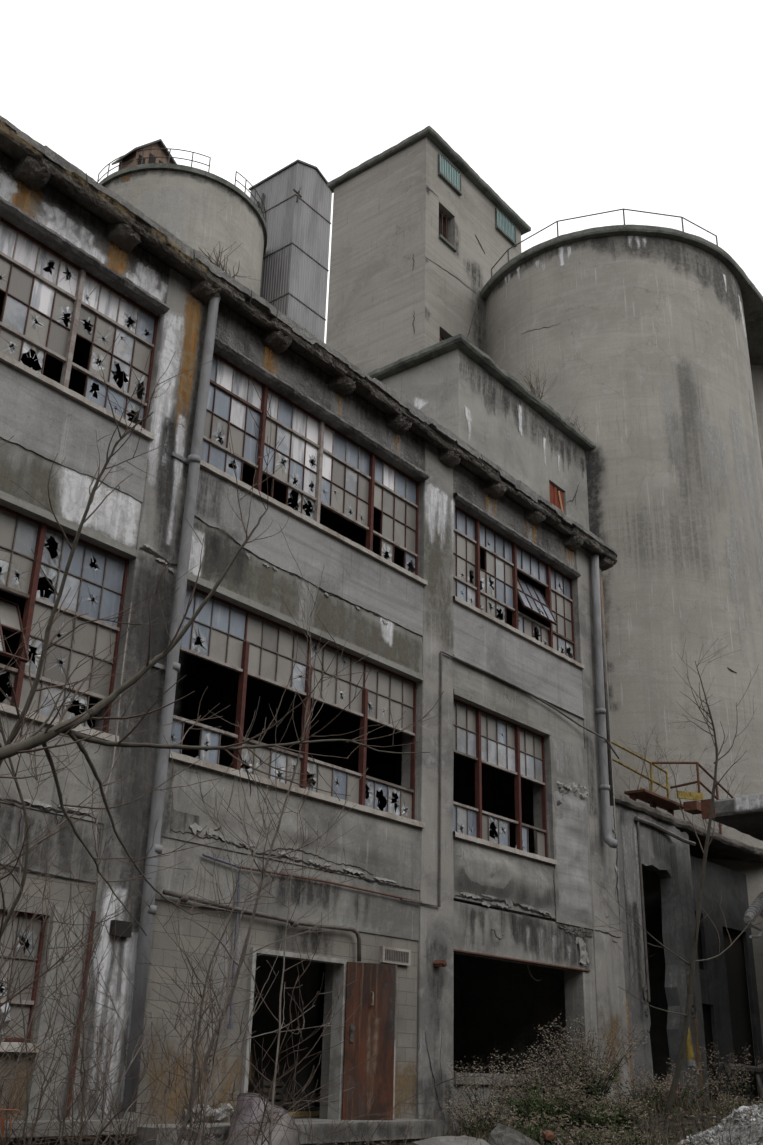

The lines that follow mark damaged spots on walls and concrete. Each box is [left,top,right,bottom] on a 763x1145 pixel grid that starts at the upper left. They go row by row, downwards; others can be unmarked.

damp [37,187,106,264]
damp [97,170,264,237]
corrosion [177,294,200,416]
damp [0,446,141,546]
damp [460,362,604,537]
damp [75,247,420,1120]
damp [460,869,587,968]